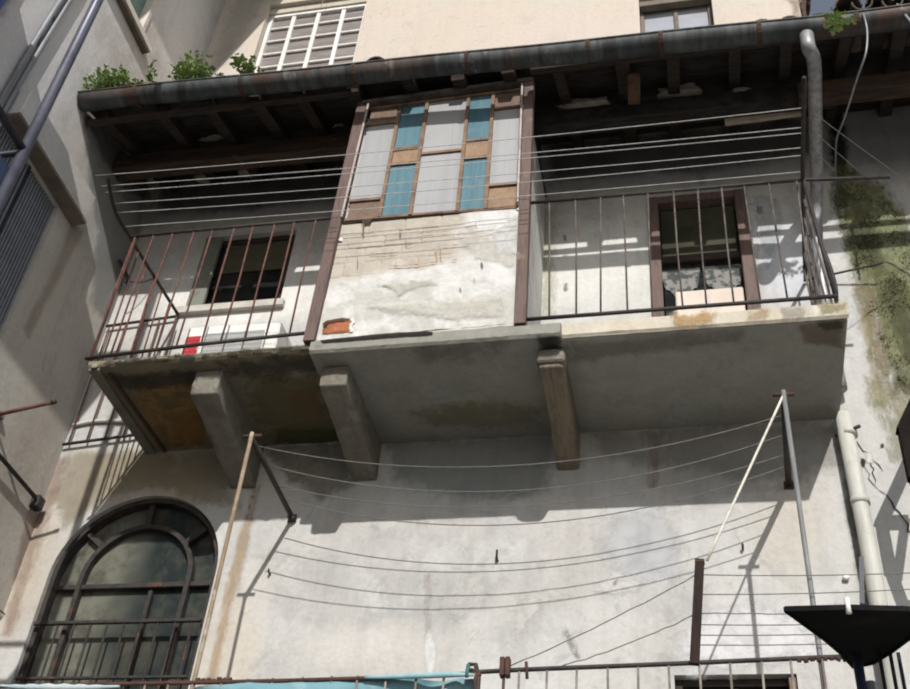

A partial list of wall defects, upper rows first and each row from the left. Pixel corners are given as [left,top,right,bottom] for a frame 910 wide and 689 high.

spalling [322,318,355,334]
rust [674,311,713,327]
damp [801,321,843,346]
rust [114,370,208,449]
damp [272,443,351,497]
crack [857,442,910,532]